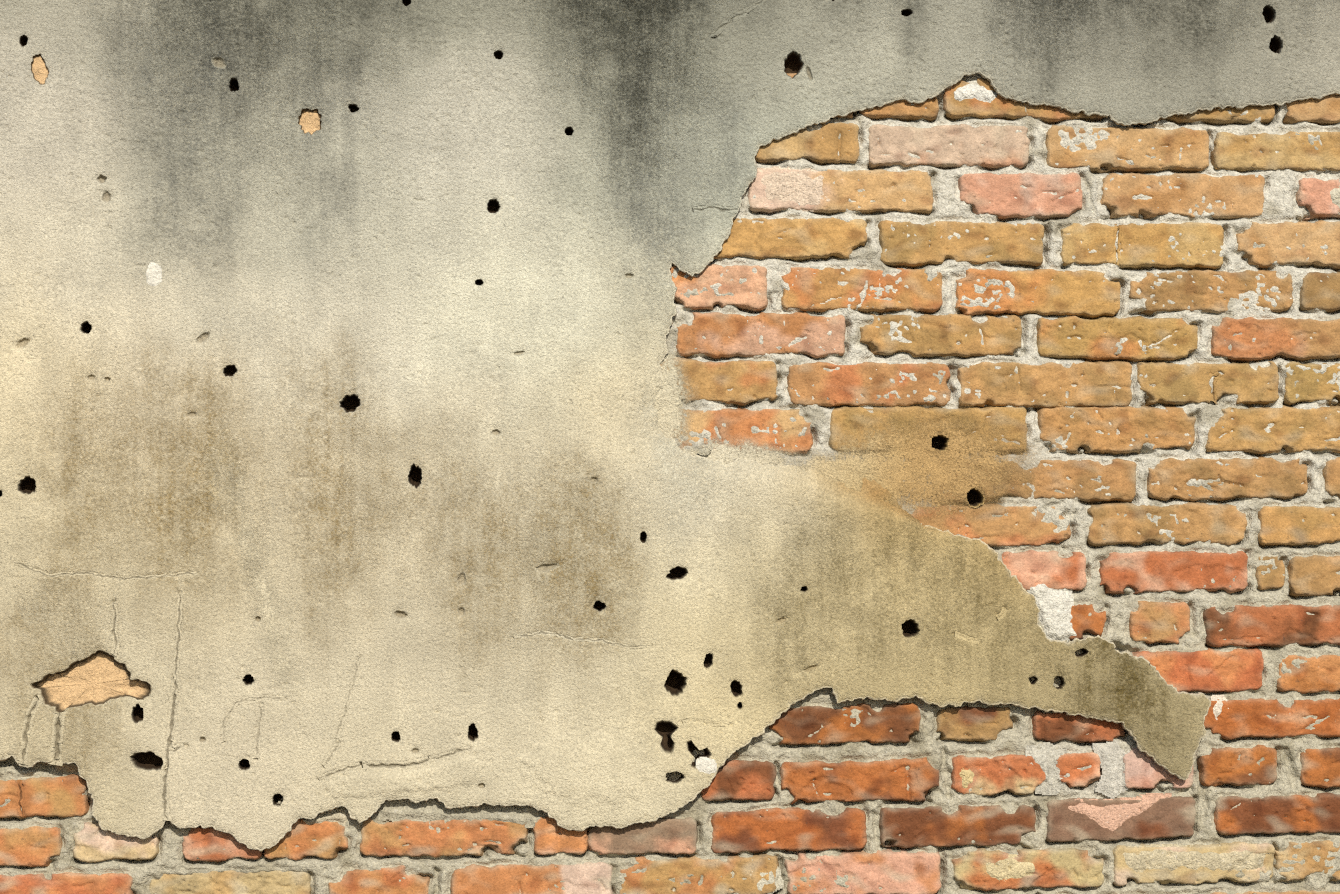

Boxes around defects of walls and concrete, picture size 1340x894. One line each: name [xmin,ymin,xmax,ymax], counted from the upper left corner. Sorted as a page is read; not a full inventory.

damp [579,0,689,61]
spalling [96,174,112,203]
peeling [146,262,162,286]
flaking render [658,71,1340,467]
spalling [15,338,31,349]
spalling [195,331,211,345]
flaking render [0,356,1340,894]
crack [11,560,198,821]